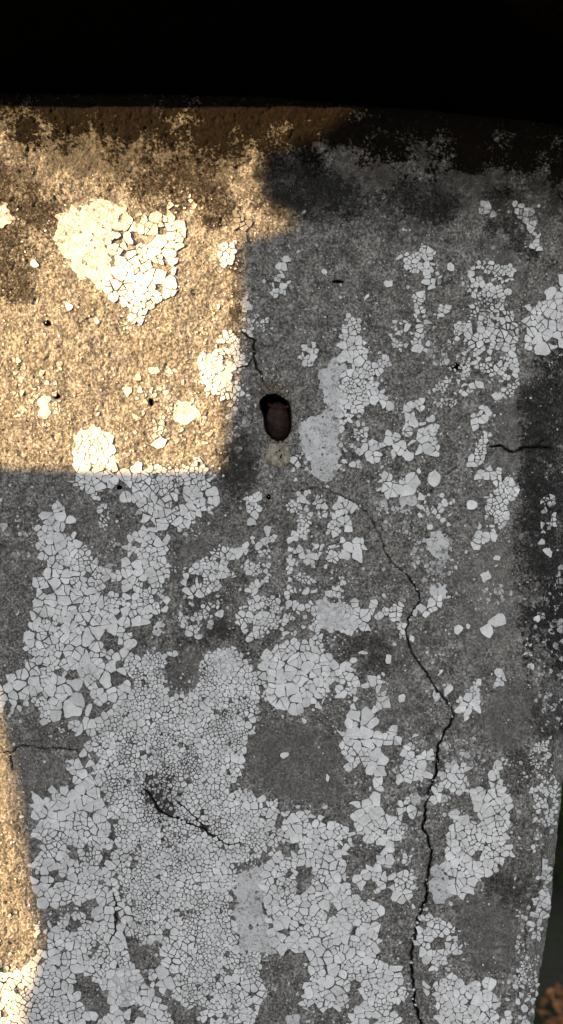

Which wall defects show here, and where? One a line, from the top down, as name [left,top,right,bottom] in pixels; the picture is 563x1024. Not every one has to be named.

peeling [100,187,197,325]
leakage [0,93,563,310]
peeling [122,314,269,462]
peeling [297,341,319,367]
peeling [336,245,563,582]
crack [491,440,548,453]
crack [152,799,241,845]
peeling [0,432,563,1024]
crack [290,486,454,1024]